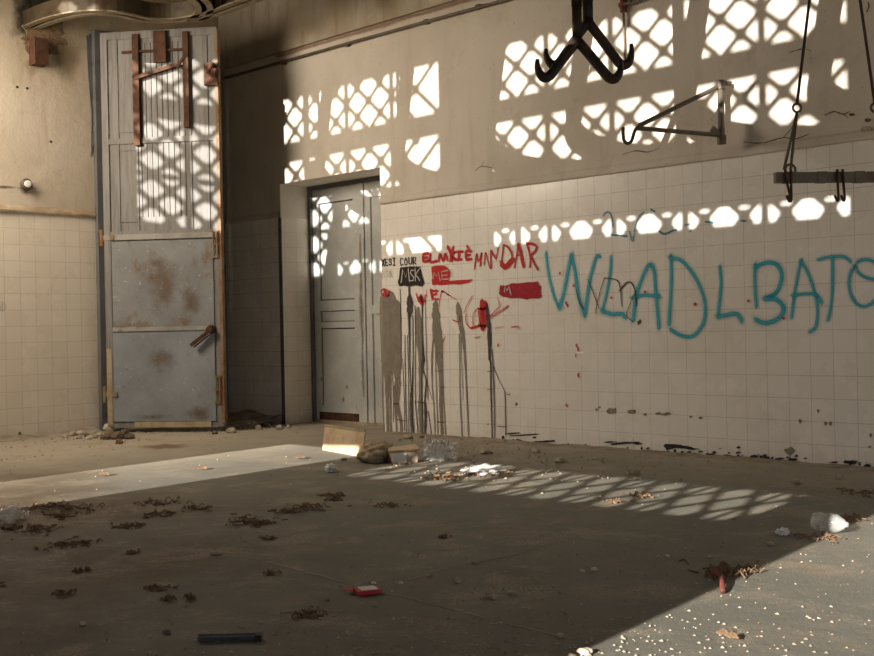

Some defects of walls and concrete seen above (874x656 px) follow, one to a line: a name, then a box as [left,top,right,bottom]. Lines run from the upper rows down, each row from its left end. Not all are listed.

spalling [20,22,67,55]
spalling [664,444,807,461]